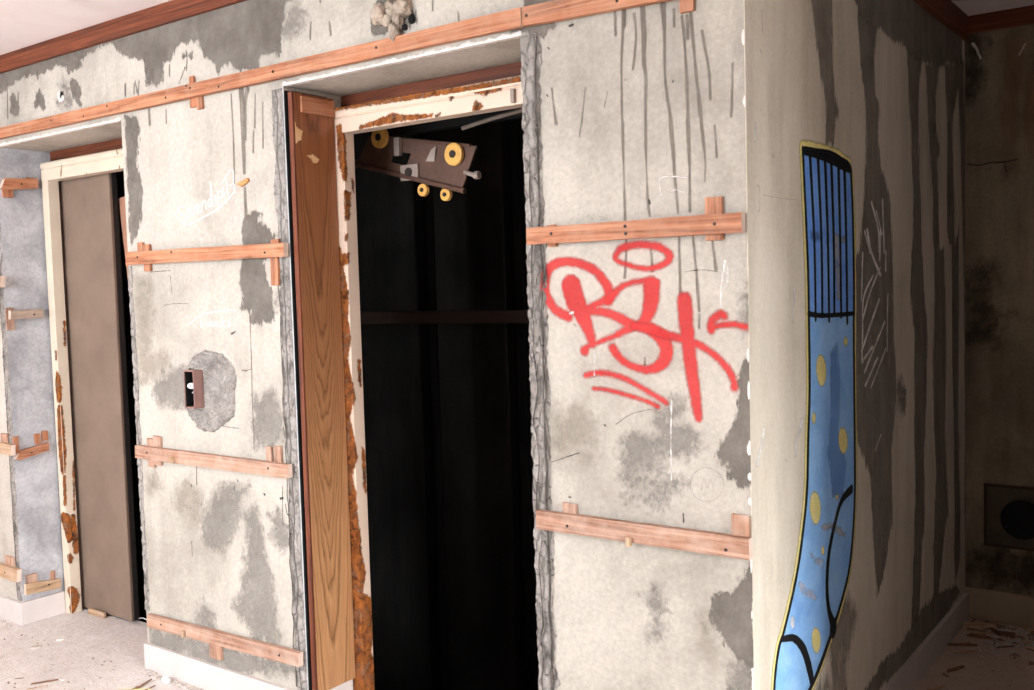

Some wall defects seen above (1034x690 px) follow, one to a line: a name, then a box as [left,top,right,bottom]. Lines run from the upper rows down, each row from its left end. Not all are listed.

rust [335,76,521,130]
damp [614,6,650,221]
damp [660,2,718,212]
damp [812,0,839,146]
rust [55,320,79,564]
rust [68,586,81,613]
spalling [187,349,237,433]
damp [177,482,289,643]
rust [336,124,375,690]
spalling [271,31,545,690]
spalling [526,243,560,690]
damp [855,0,1034,690]